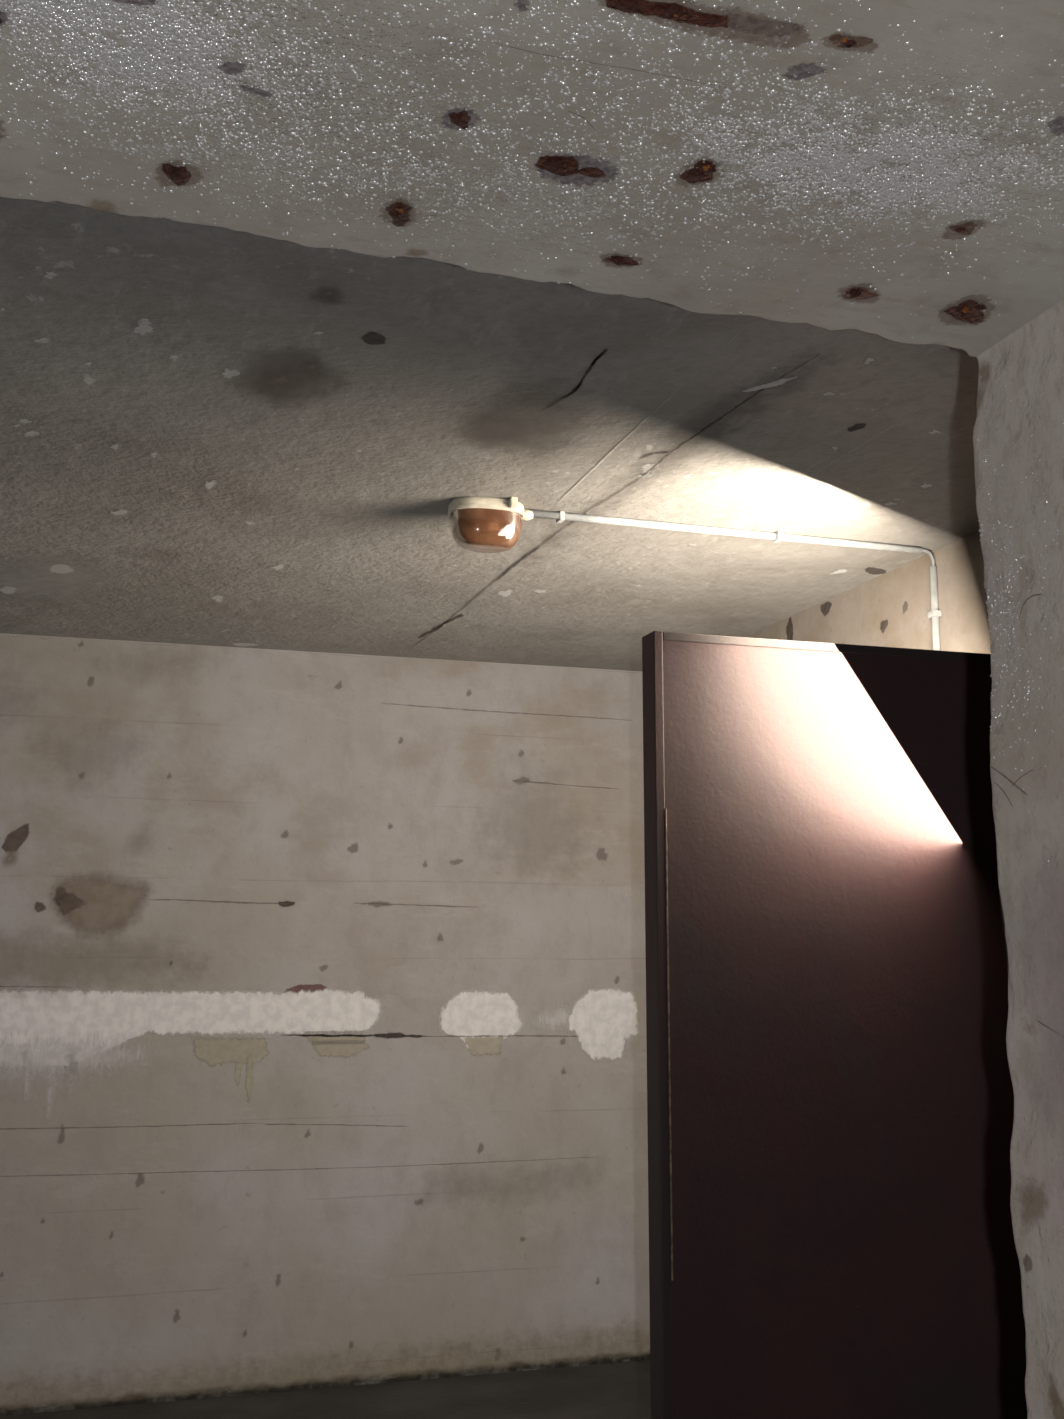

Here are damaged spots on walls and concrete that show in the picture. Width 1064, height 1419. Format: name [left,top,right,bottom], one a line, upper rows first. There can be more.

rust [606,0,801,37]
rust [829,34,873,48]
rust [442,108,481,130]
rust [163,164,191,186]
rust [534,152,618,187]
rust [680,161,716,184]
rust [387,202,412,227]
rust [604,255,638,266]
rust [944,300,987,324]
leakage [243,355,328,402]
crack [409,349,821,650]
leakage [35,877,146,932]